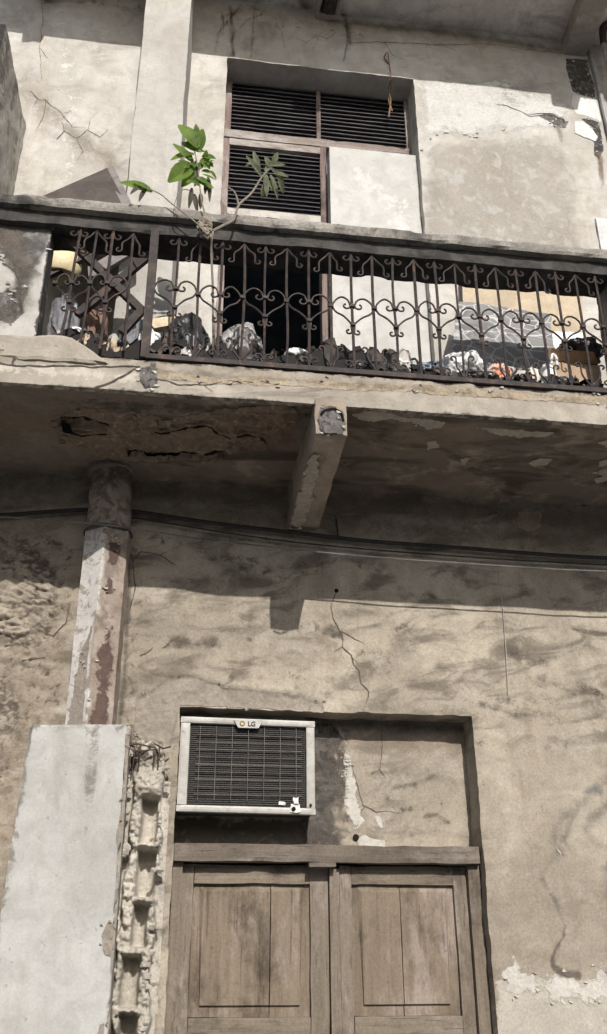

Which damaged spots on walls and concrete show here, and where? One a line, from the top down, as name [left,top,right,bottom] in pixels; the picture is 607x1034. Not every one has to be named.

crack [31,11,102,157]
peeling [566,58,595,99]
peeling [582,118,604,177]
peeling [0,225,52,325]
flaking render [50,404,445,464]
peeling [289,454,320,529]
peeling [592,440,607,483]
corrosion [87,626,113,724]
crack [331,593,369,710]
spalling [98,675,386,1034]
peeling [501,955,607,1006]
water stain [551,932,581,979]